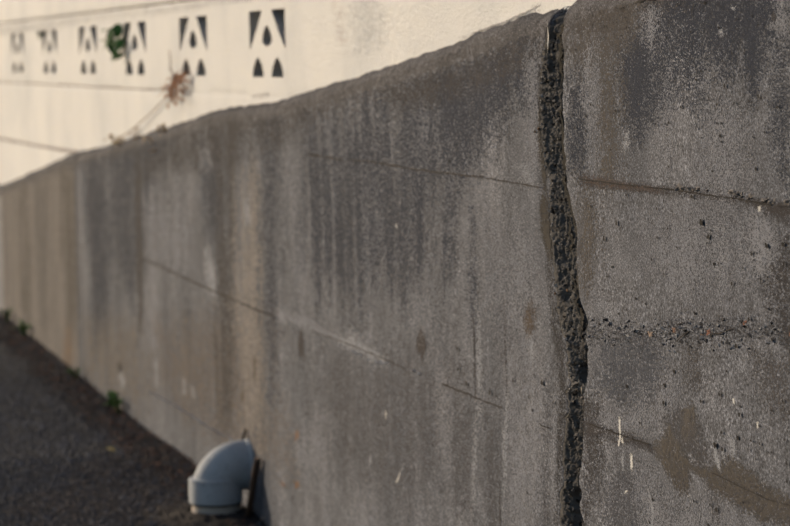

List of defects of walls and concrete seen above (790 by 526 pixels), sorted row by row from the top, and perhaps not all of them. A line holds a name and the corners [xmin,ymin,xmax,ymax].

damp [16,36,567,526]
crack [309,13,790,526]
damp [580,329,790,526]